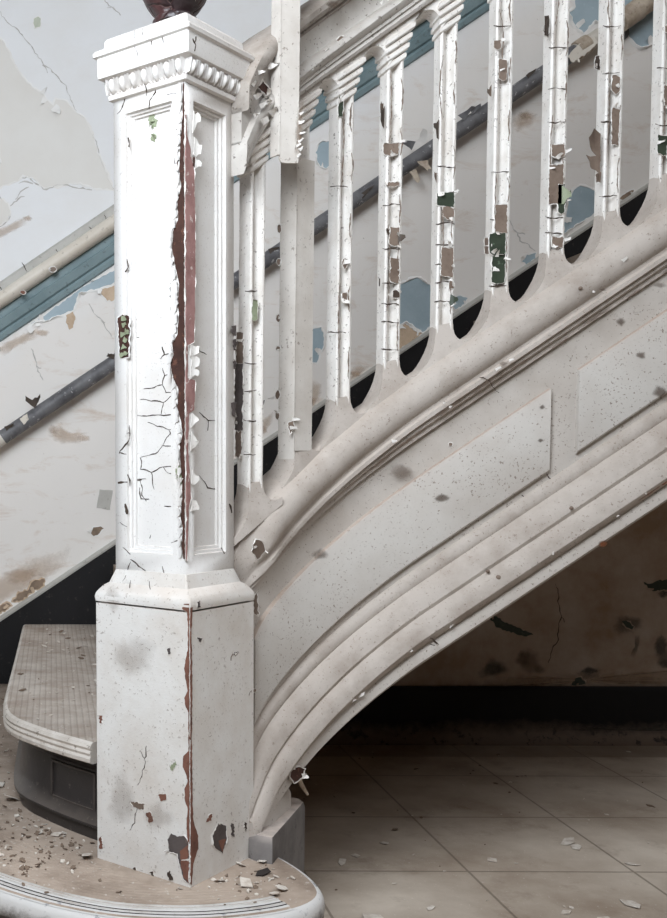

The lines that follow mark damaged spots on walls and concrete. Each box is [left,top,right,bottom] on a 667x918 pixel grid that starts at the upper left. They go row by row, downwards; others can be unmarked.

crack [1,14,75,109]
peeling [569,0,599,35]
peeling [627,11,653,51]
peeling [26,267,115,334]
peeling [167,82,202,561]
peeling [379,226,431,349]
crack [103,347,171,588]
peeling [163,601,203,885]
peeling [130,801,154,823]
peeling [206,813,248,855]